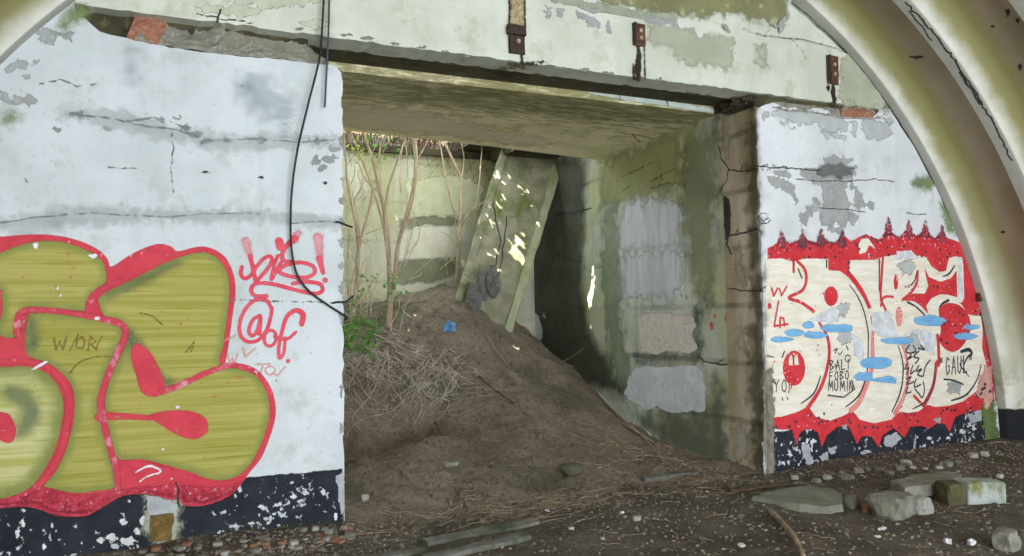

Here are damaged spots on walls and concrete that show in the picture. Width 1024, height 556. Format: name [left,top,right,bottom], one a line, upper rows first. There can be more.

peeling [36,28,75,46]
peeling [543,6,612,34]
peeling [0,90,38,106]
peeling [5,59,40,80]
rust [632,46,646,82]
crack [904,2,1013,161]
peeling [762,101,893,141]
crack [0,79,328,223]
peeling [767,154,875,235]
crack [727,212,771,237]
water stain [634,104,768,472]